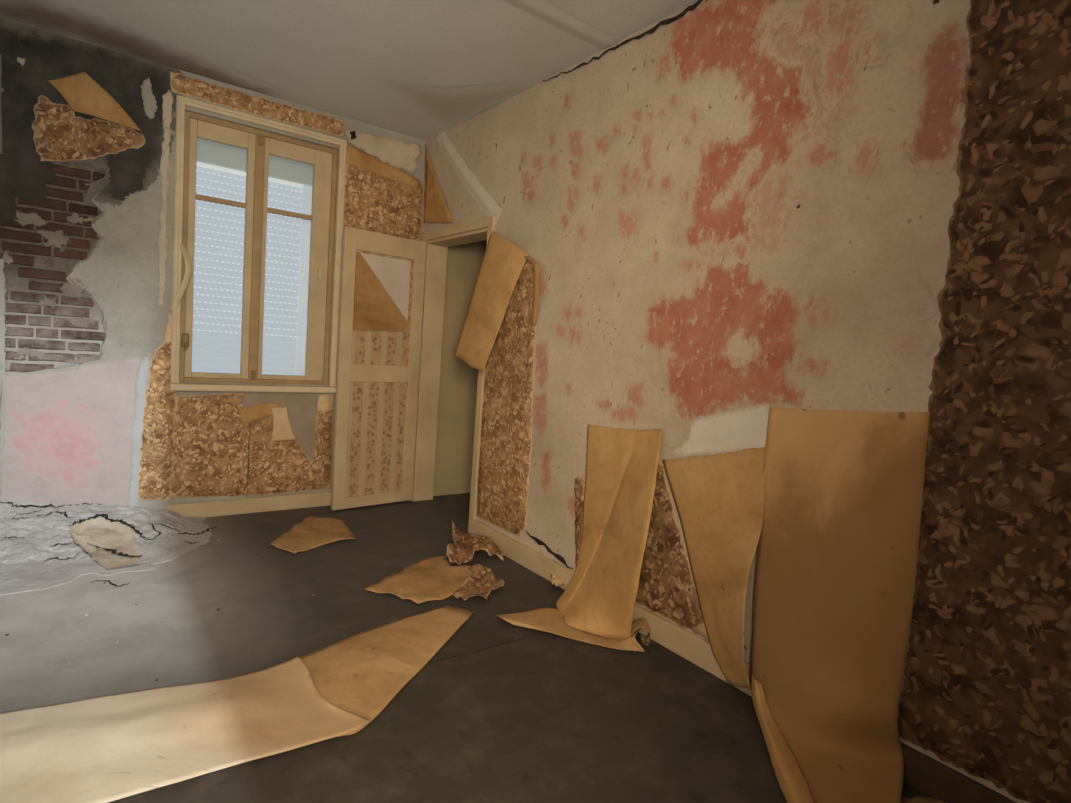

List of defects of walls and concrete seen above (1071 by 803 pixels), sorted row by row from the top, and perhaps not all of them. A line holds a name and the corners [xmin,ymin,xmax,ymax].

crack [542,0,708,81]
spalling [140,77,173,307]
peeling [346,128,453,223]
peeling [361,253,411,321]
spalling [0,160,110,496]
peeling [243,392,317,461]
crack [0,502,217,561]